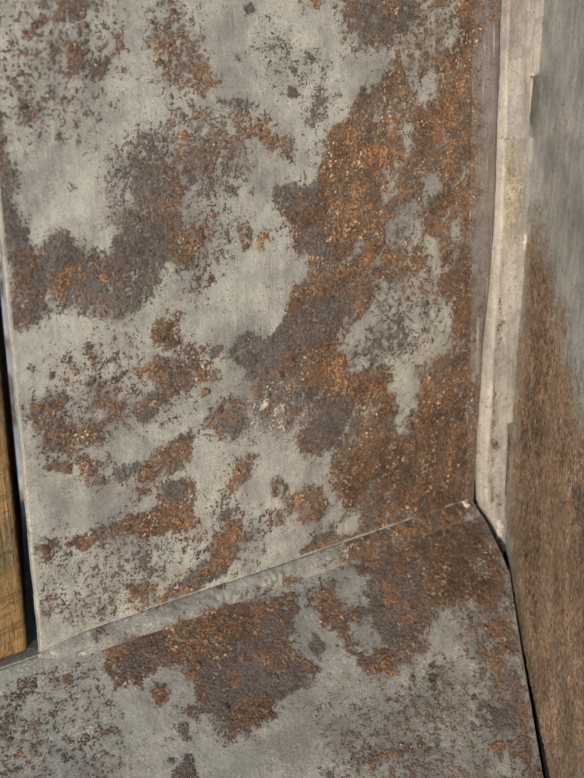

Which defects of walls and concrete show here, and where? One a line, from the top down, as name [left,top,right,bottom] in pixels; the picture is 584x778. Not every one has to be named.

corrosion [94,0,299,306]